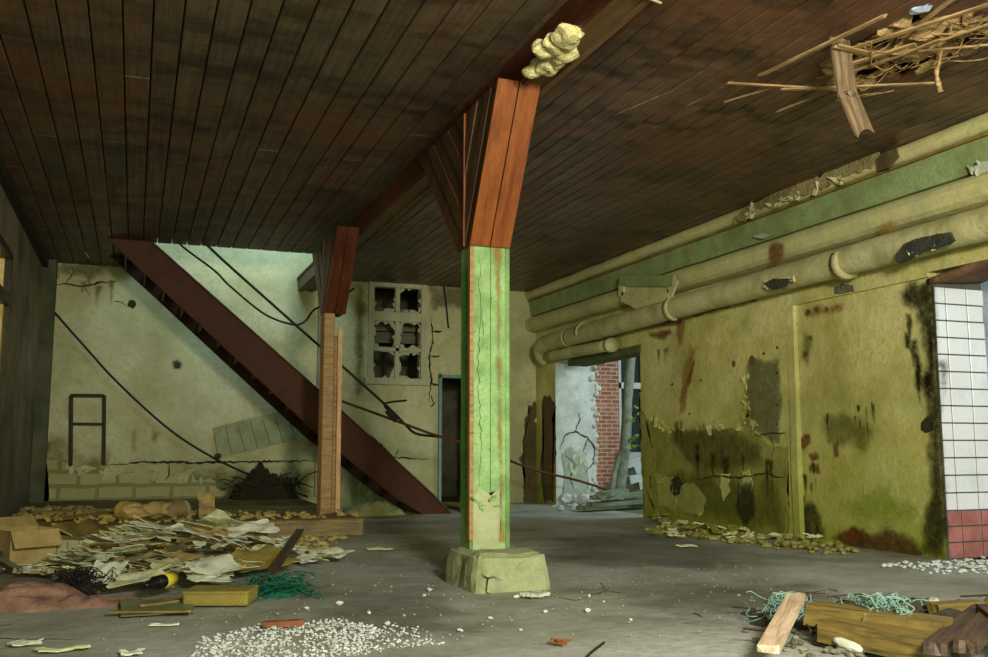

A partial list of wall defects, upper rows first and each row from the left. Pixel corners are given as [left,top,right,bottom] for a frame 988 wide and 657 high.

corrosion [769,243,784,265]
crack [428,317,442,407]
corrosion [680,351,694,411]
crack [561,413,596,489]
flaking render [639,355,791,535]
water stain [674,423,782,530]
crack [694,432,786,508]
water stain [824,403,875,448]
water stain [835,282,949,559]